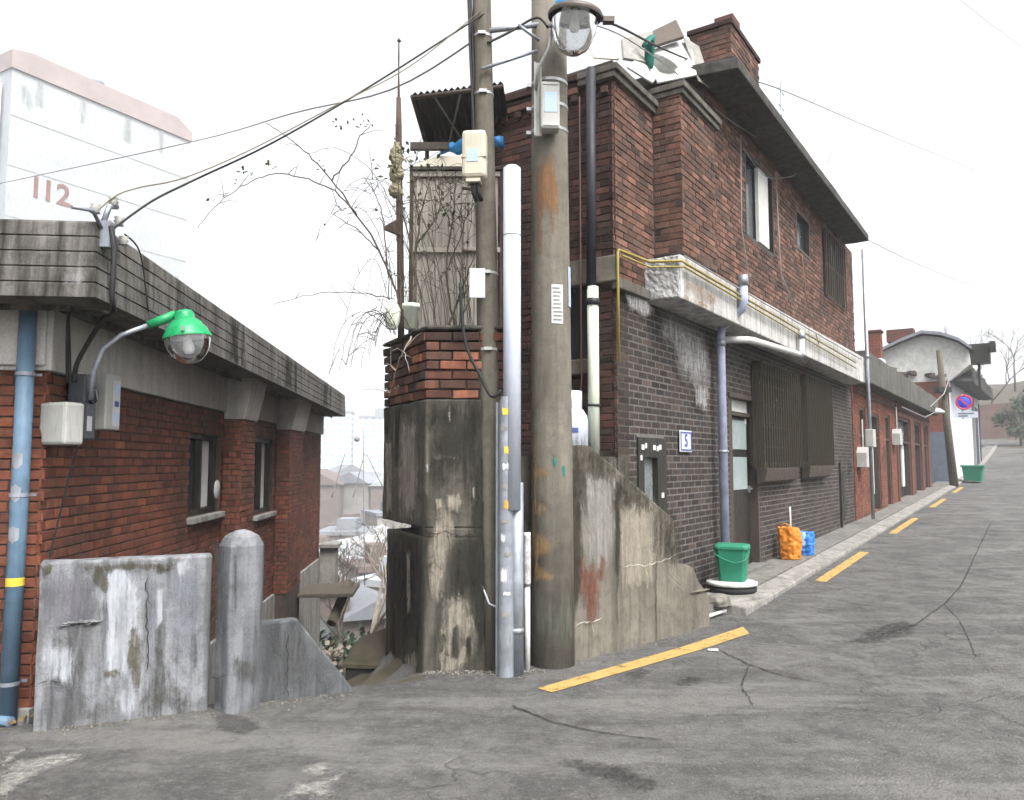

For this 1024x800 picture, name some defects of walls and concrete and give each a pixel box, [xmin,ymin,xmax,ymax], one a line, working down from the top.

corrosion [536,158,558,250]
efflorescence [628,297,649,315]
efflorescence [663,313,710,409]
water stain [385,406,399,466]
water stain [93,567,106,586]
crack [144,578,152,669]
water stain [143,599,190,713]
water stain [389,492,428,671]
water stain [426,405,485,658]
corrosion [580,557,604,623]
crack [575,521,676,637]